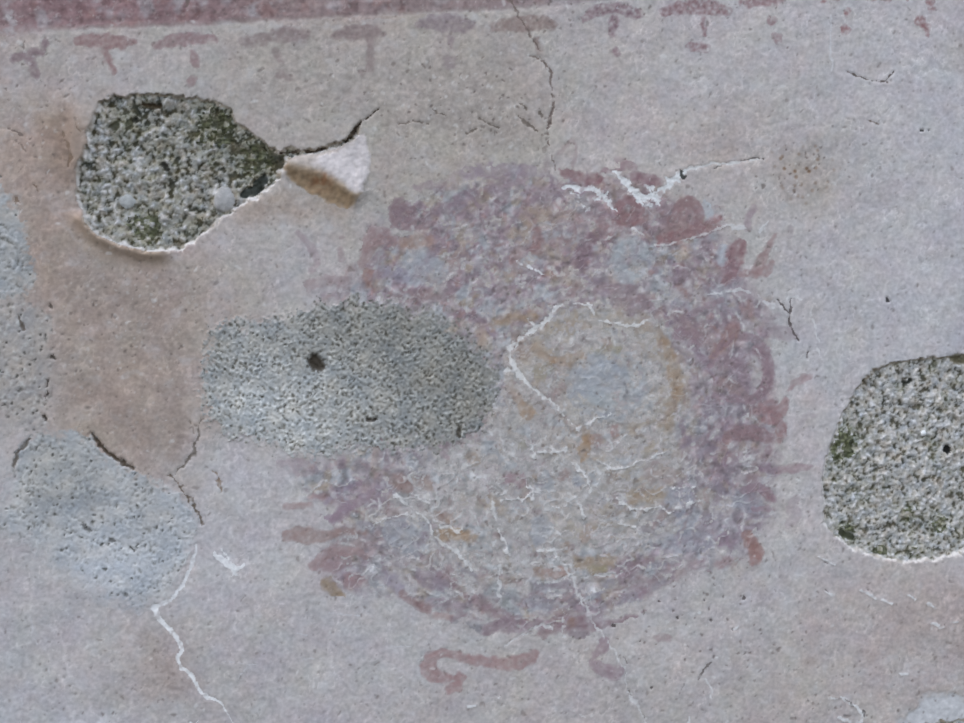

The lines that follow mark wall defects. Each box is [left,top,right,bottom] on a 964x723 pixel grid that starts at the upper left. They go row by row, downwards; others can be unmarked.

flaking render [75,92,372,252]
leakage [230,179,359,231]
crack [506,0,769,250]
spalling [308,352,325,374]
crack [707,287,824,362]
flaking render [820,352,964,566]
crack [150,417,233,723]
flaking render [895,690,964,723]